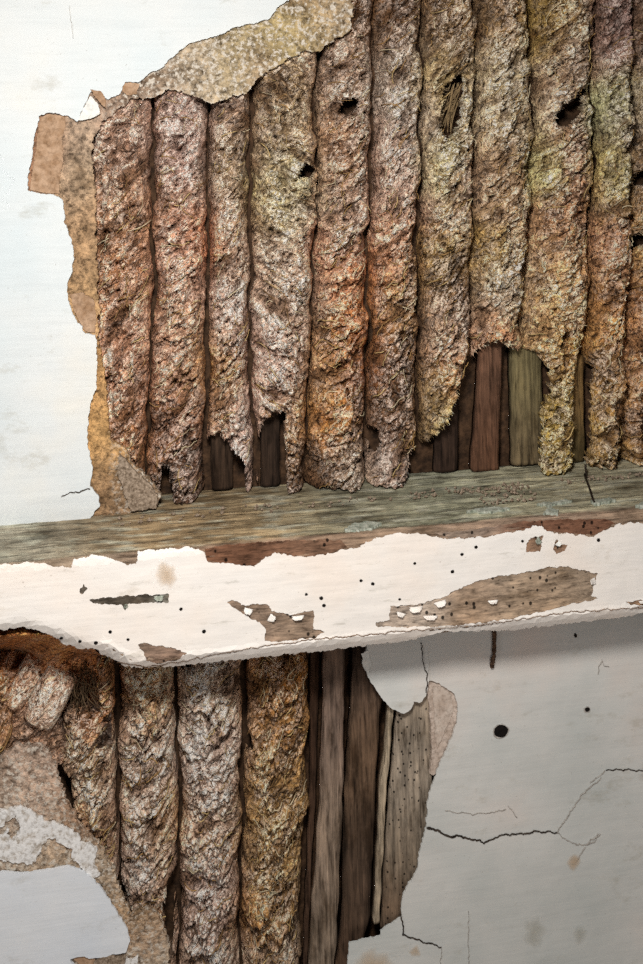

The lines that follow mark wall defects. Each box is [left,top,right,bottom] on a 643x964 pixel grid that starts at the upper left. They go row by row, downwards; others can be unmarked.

flaking render [28,0,354,516]
peeling [436,518,615,554]
peeling [138,644,185,664]
peeling [227,600,324,642]
peeling [361,566,597,775]
flaking render [0,741,170,964]
crack [427,768,643,865]
crack [399,914,442,964]